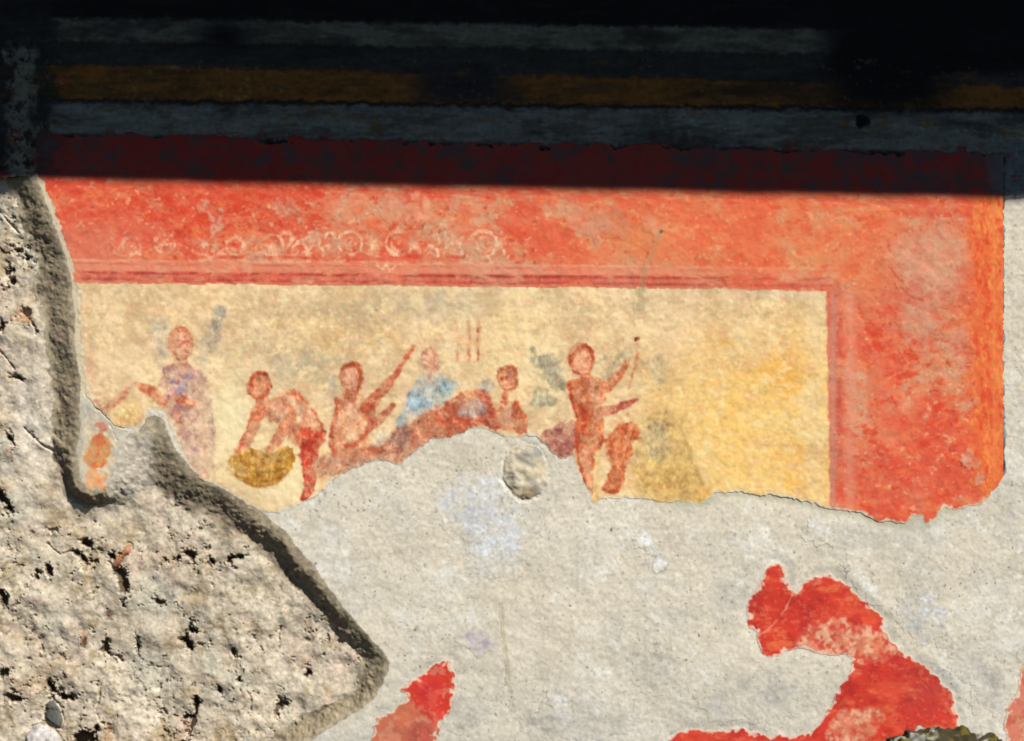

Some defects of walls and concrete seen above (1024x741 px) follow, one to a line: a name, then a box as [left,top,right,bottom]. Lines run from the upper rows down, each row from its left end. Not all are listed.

peeling [78,409,120,494]
spalling [0,489,16,515]
spalling [159,546,249,566]
spalling [32,562,54,582]
spalling [69,537,132,608]
spalling [0,588,10,608]
spalling [97,632,142,660]
spalling [177,617,212,653]
peeling [790,613,903,668]
spalling [270,692,292,720]
spalling [72,723,101,741]
peeling [821,704,888,741]